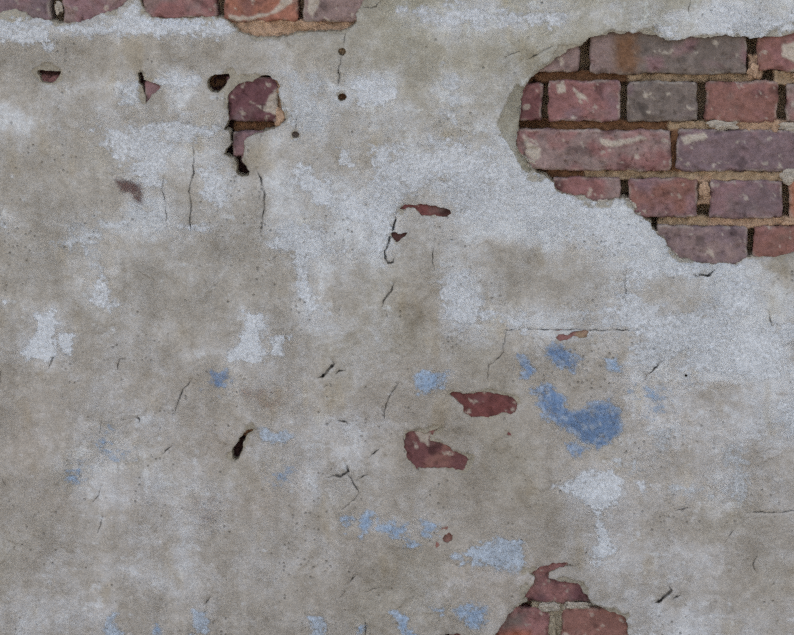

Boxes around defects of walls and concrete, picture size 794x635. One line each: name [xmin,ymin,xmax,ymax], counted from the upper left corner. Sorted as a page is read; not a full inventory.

flaking render [0,0,128,24]
flaking render [140,0,364,38]
flaking render [37,70,61,83]
flaking render [171,74,285,177]
flaking render [498,31,794,265]
flaking render [400,204,451,217]
flaking render [450,391,517,417]
flaking render [231,429,253,461]
flaking render [404,429,469,470]
flaking render [495,562,628,635]